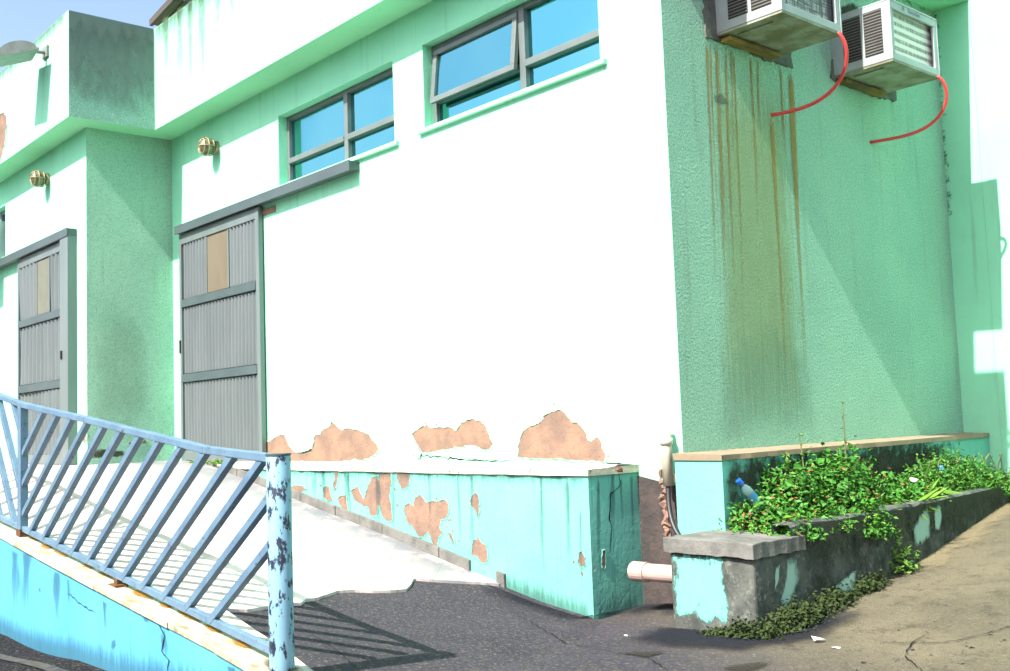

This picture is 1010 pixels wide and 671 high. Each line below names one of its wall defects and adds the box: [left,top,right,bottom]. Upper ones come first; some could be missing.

rust [706,47,741,213]
rust [750,62,760,158]
rust [771,70,802,292]
peeling [266,417,497,566]
peeling [514,403,629,472]
peeling [572,549,607,575]
spalling [638,468,728,624]
peeling [775,561,798,606]